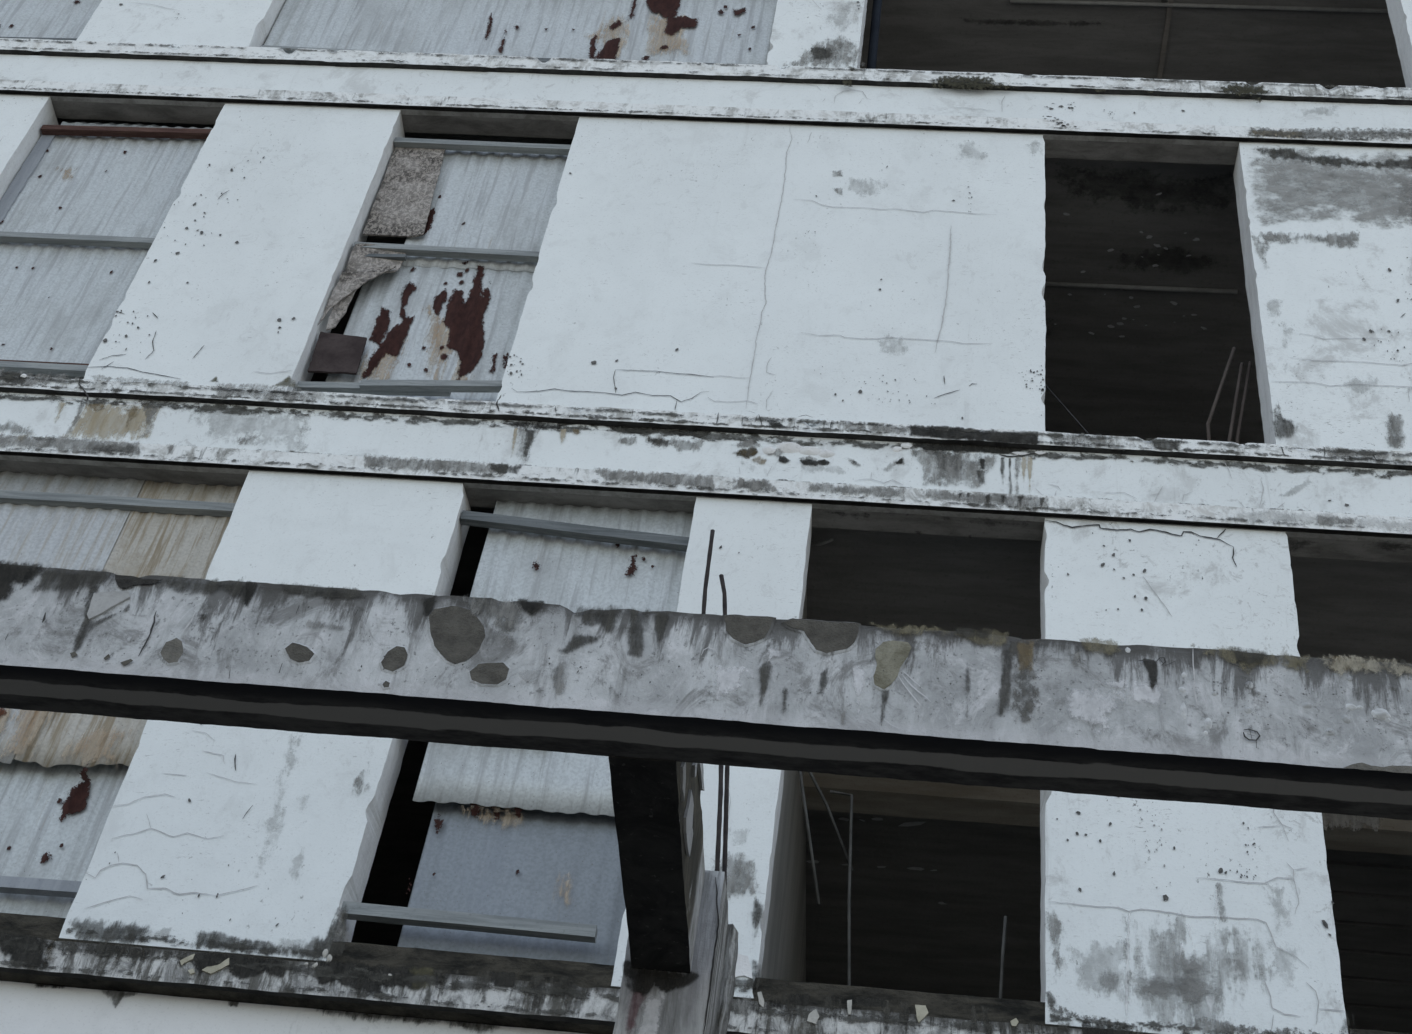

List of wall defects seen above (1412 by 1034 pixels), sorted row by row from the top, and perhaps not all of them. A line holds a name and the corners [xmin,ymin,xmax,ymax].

rust [572,0,698,60]
damp [1249,127,1412,262]
crack [496,83,996,428]
rust [360,261,509,380]
damp [0,368,1412,524]
spalling [271,642,322,665]
spalling [379,630,410,690]
spalling [427,605,515,687]
damp [551,605,668,694]
rust [57,764,91,822]
crack [84,731,258,909]
damp [728,883,1317,1034]